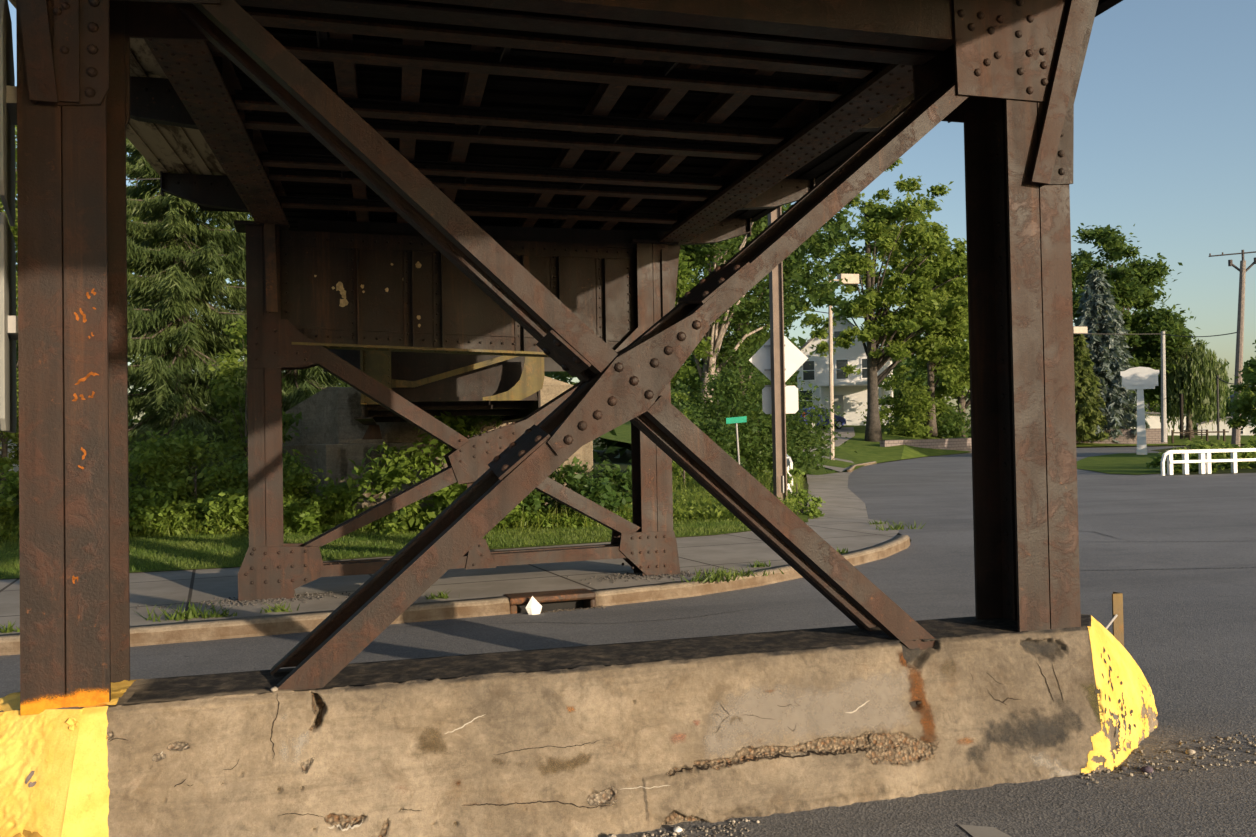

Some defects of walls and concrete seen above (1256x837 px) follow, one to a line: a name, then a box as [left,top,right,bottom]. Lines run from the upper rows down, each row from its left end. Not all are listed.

peeling [332,282,349,307]
crack [270,700,280,759]
spalling [310,693,325,730]
rust [899,652,936,743]
peeling [1095,646,1136,750]
spalling [313,813,365,831]